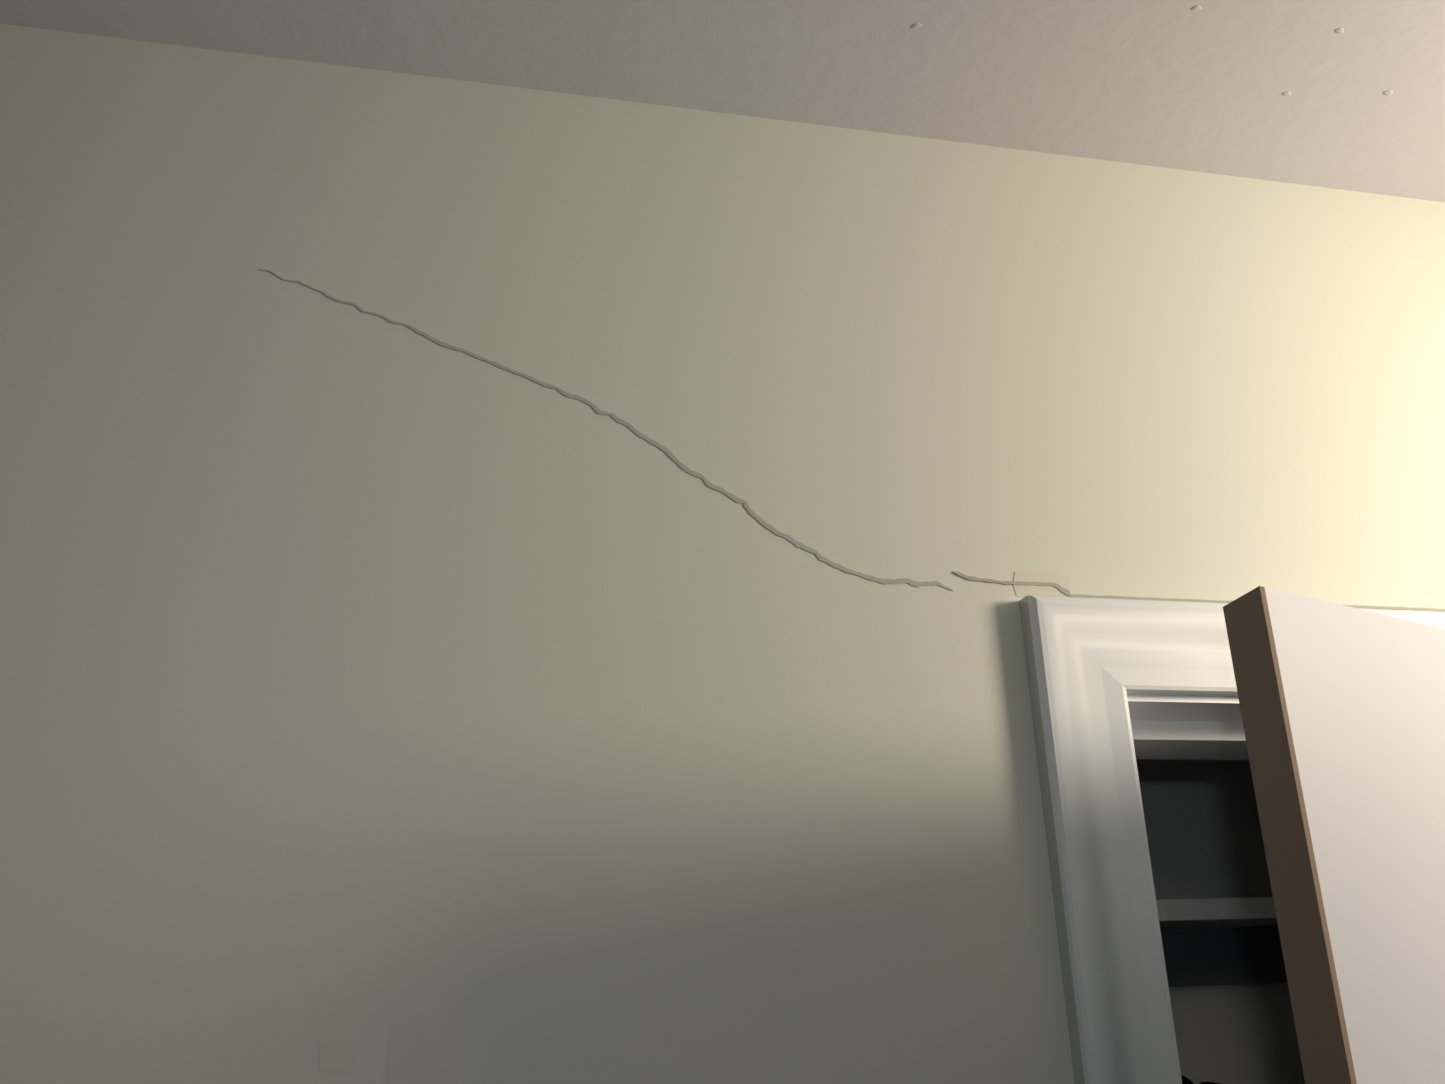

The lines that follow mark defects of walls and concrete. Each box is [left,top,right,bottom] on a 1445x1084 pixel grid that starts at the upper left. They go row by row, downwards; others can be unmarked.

crack [258,269,1232,603]
crack [1344,604,1445,612]